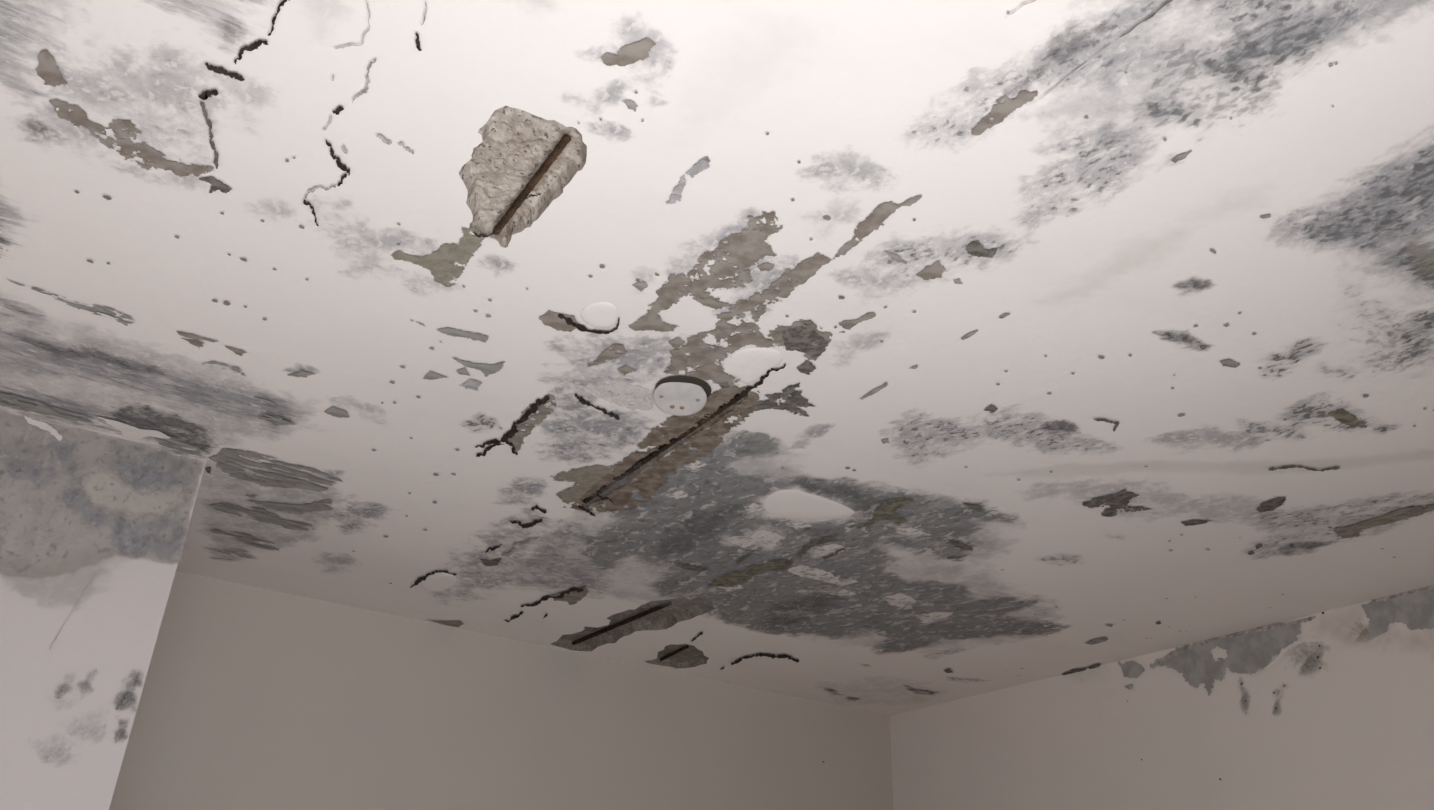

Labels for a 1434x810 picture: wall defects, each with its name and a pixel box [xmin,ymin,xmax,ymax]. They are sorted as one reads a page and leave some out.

peeling [35,50,232,194]
crack [198,0,290,169]
crack [303,0,414,226]
crack [415,2,427,51]
spalling [391,105,587,287]
mould [1207,0,1354,92]
mould [1292,146,1434,286]
mould [0,391,382,560]
spalling [475,394,556,457]
spalling [551,536,846,669]
peeling [539,195,922,516]
water stain [467,431,1066,653]